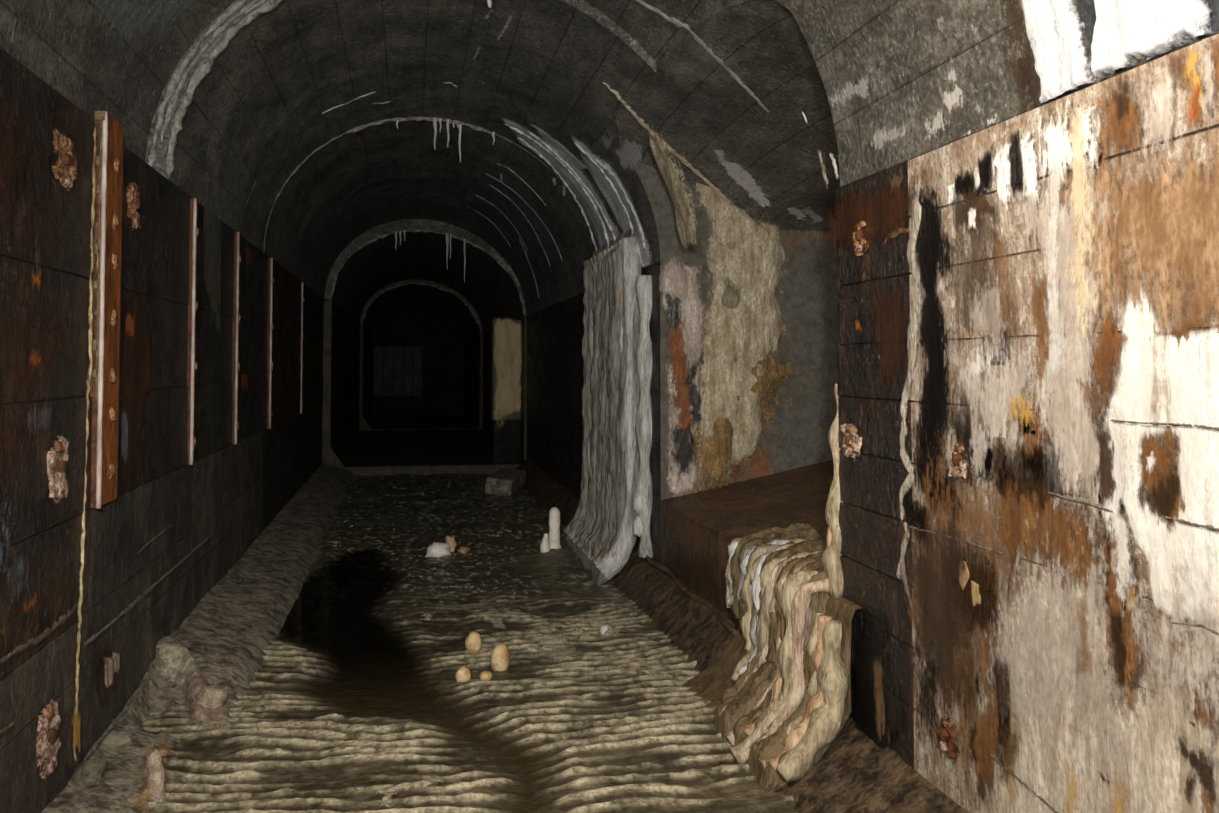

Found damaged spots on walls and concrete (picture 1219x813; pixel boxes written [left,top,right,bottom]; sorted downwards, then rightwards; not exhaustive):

efflorescence [148,0,284,178]
efflorescence [279,117,492,195]
efflorescence [330,163,562,425]
efflorescence [503,82,806,497]
rust [825,173,915,256]
leakage [851,0,1219,813]
rust [996,75,1219,709]
rust [1169,39,1219,123]